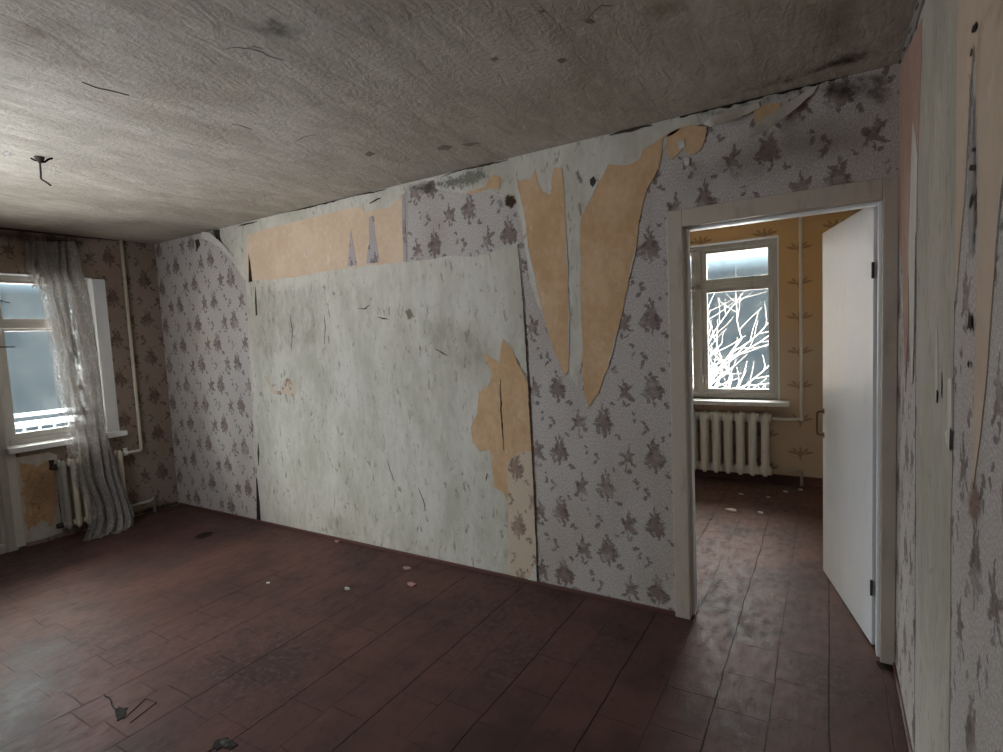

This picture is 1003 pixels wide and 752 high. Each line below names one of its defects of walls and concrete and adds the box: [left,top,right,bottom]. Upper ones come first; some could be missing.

peeling [16,452,63,543]